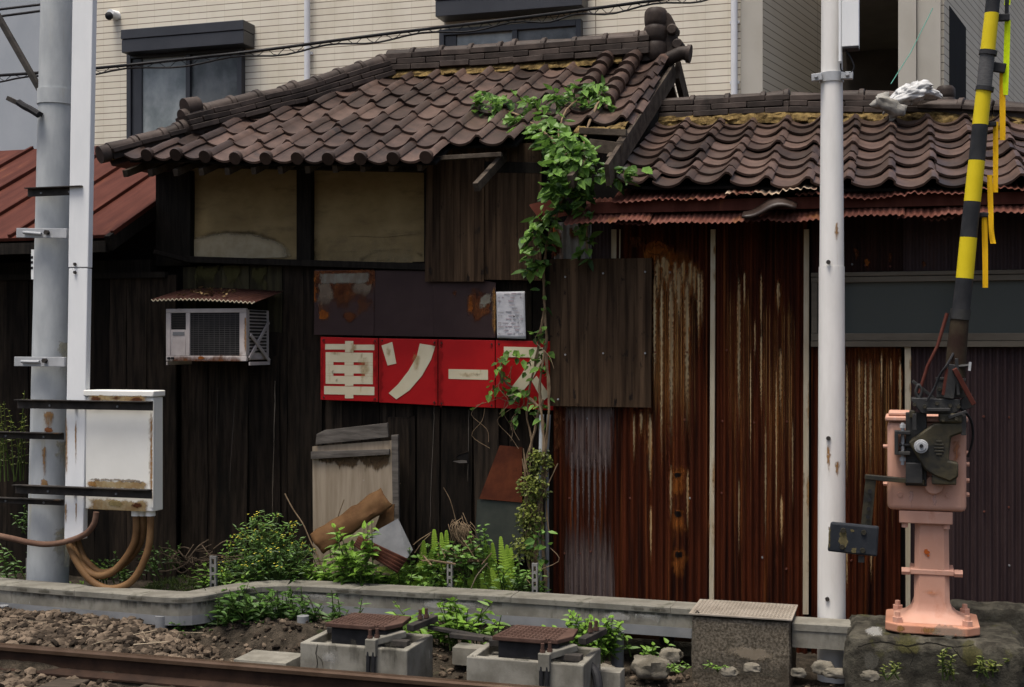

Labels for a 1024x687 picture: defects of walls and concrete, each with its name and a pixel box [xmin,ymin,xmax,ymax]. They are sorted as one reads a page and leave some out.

damp [194,232,286,289]
rust [467,289,496,332]
rust [65,418,153,519]
rust [827,347,911,517]